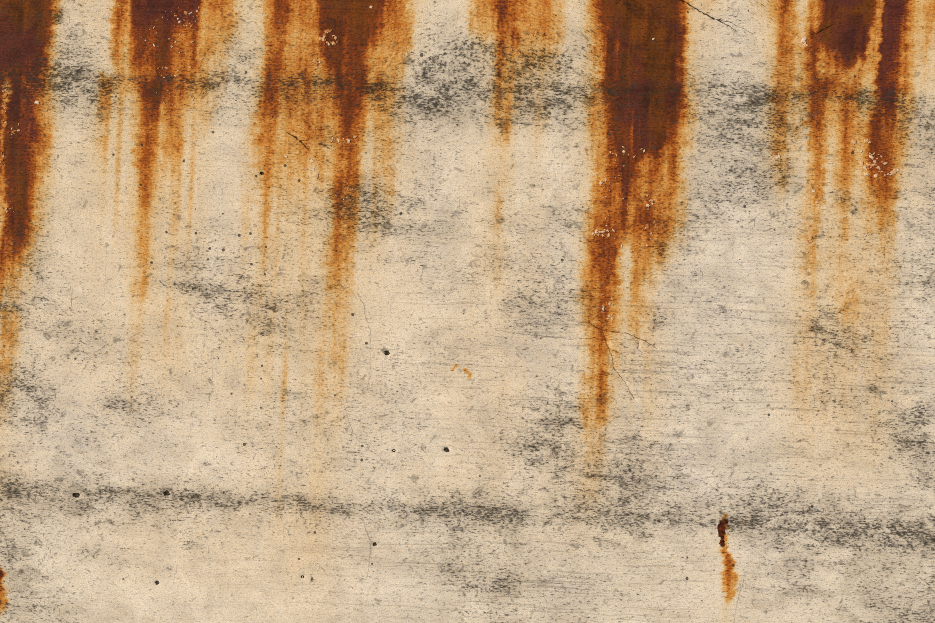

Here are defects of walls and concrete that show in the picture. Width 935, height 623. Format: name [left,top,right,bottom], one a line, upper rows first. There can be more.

corrosion [0,0,434,76]
corrosion [454,0,935,88]
crack [679,0,753,34]
water stain [0,0,935,263]
corrosion [0,87,437,497]
corrosion [445,97,703,423]
corrosion [755,101,934,514]
water stain [0,411,935,576]
water stain [0,517,66,623]
water stain [420,560,577,623]
corrosion [710,540,746,623]
water stain [888,580,935,623]